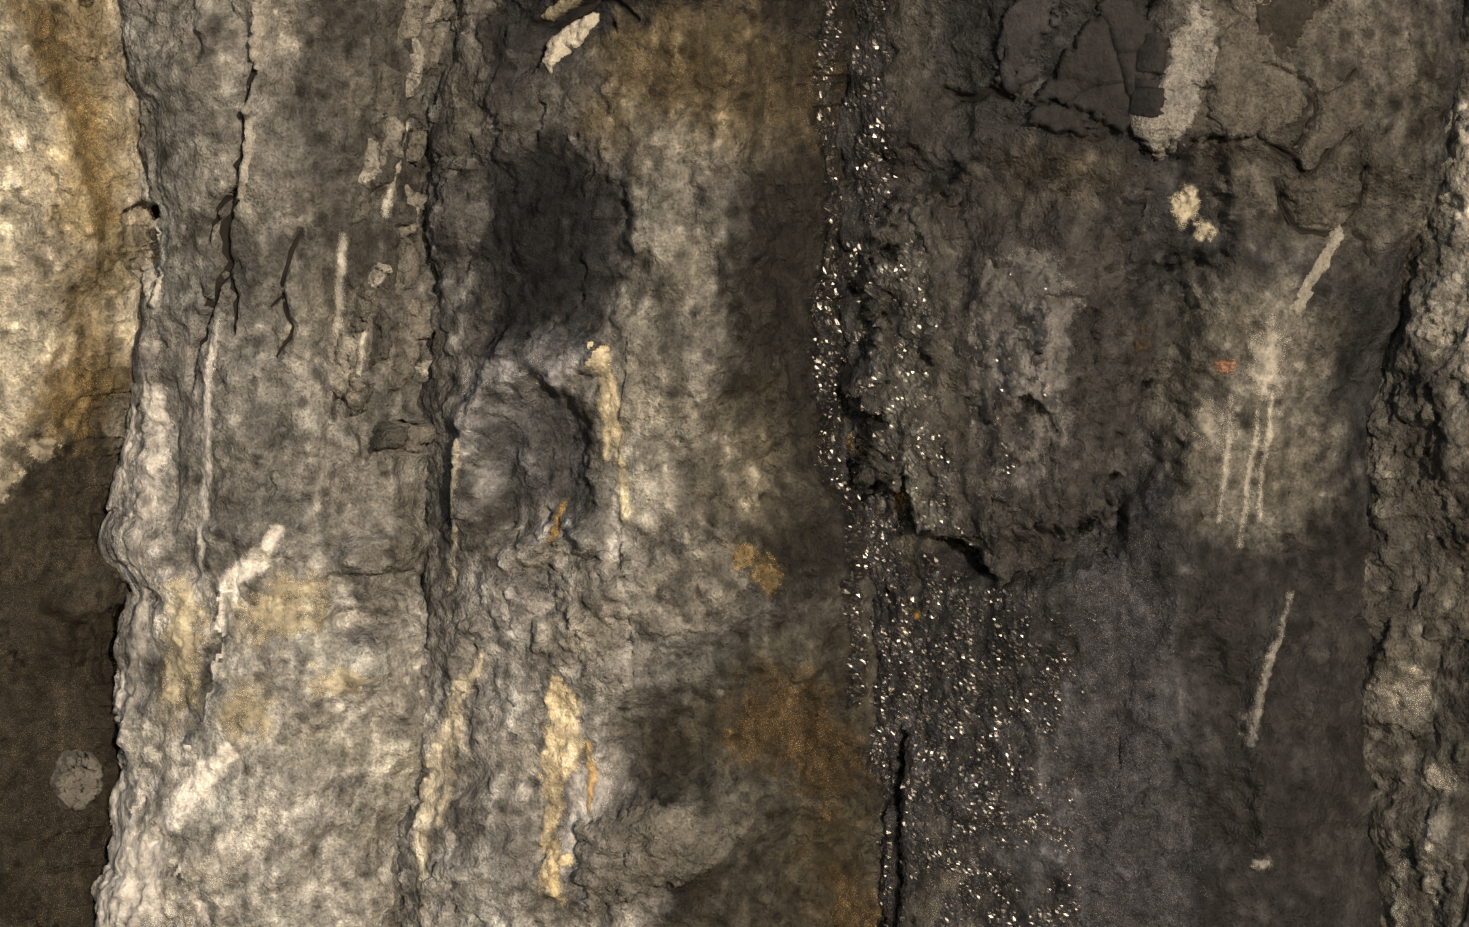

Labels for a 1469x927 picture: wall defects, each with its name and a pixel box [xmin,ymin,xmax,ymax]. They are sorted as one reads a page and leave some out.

rust [15,0,120,239]
crack [200,64,301,358]
flaking render [993,0,1369,316]
crack [1177,70,1373,266]
rust [29,360,113,441]
leakage [807,0,1216,927]